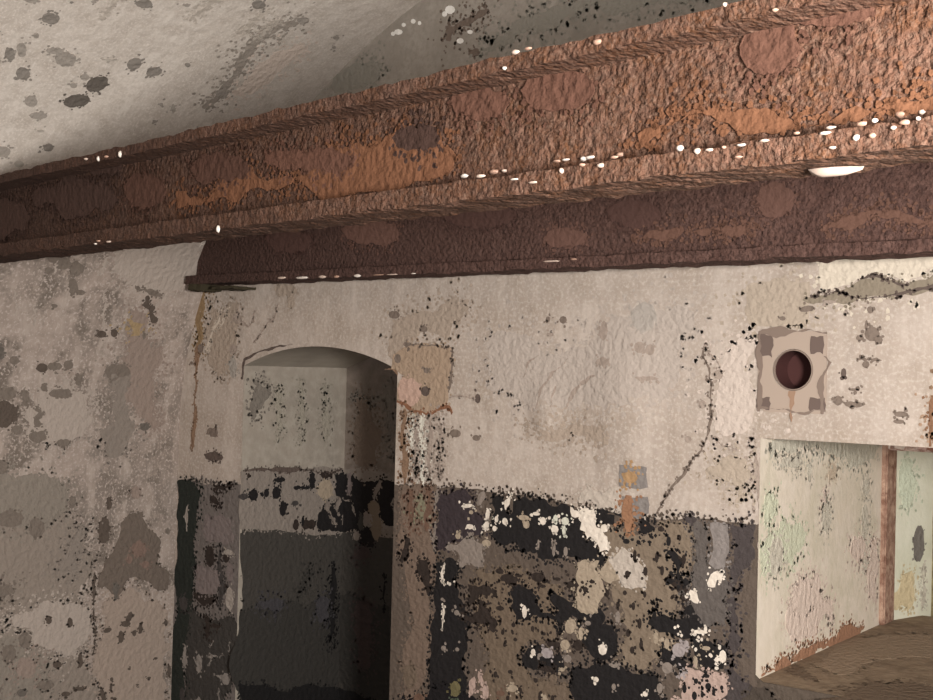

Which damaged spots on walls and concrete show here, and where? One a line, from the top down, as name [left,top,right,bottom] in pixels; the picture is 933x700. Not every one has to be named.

water stain [91,0,153,26]
water stain [41,45,166,110]
water stain [192,0,318,113]
rust [168,71,605,217]
water stain [461,169,537,184]
rust [631,181,804,249]
spalling [799,272,933,345]
crack [650,342,737,520]
rust [914,385,933,451]
spalling [445,484,648,700]
spalling [706,520,731,591]
spalling [641,625,733,700]